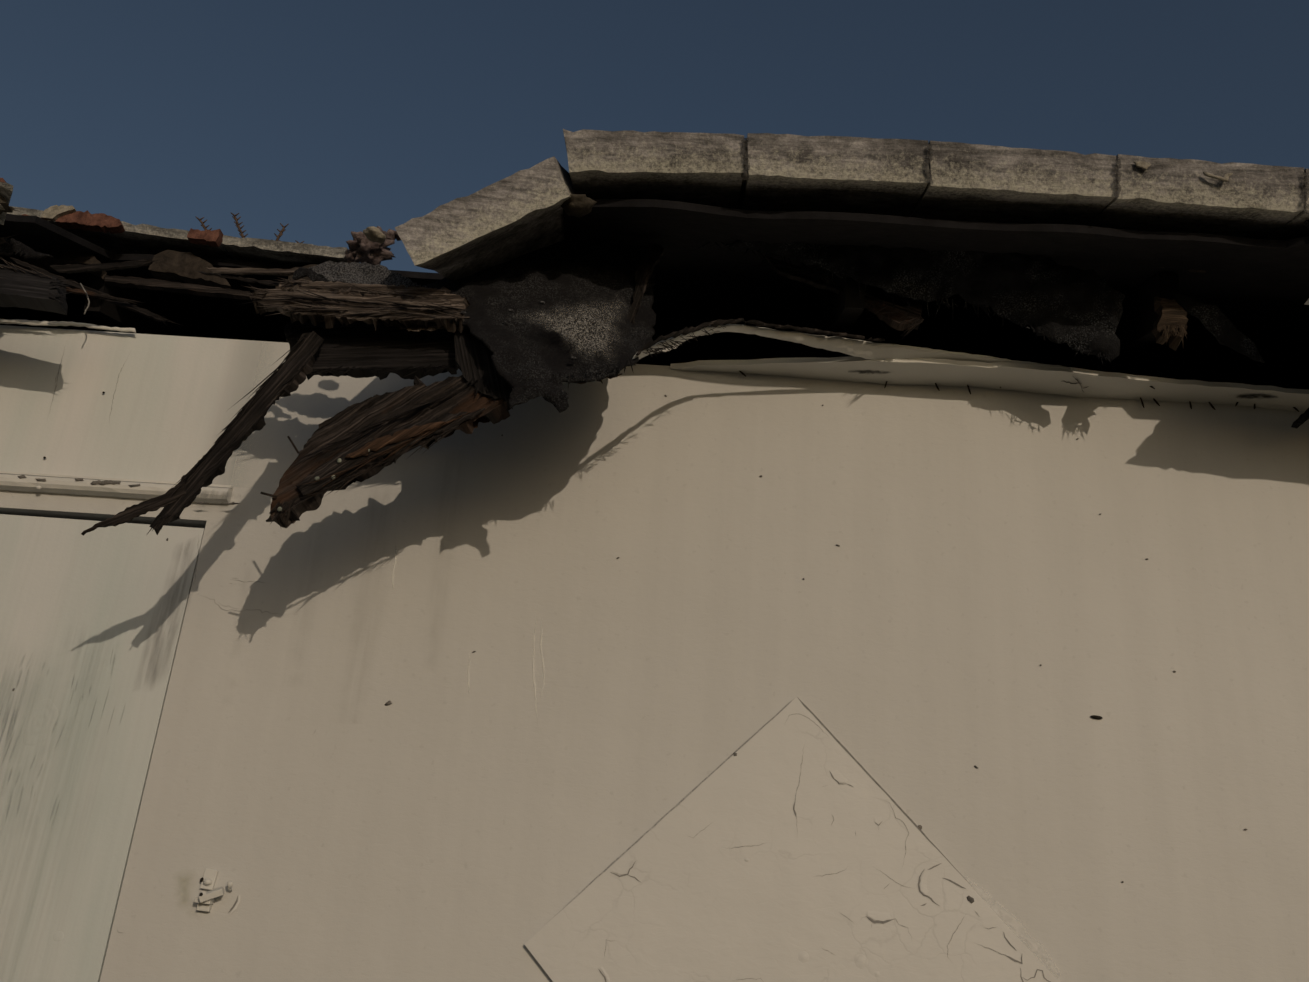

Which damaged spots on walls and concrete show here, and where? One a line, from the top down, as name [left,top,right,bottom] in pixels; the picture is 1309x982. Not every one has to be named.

crack [699,697,970,924]
crack [989,928,1050,982]